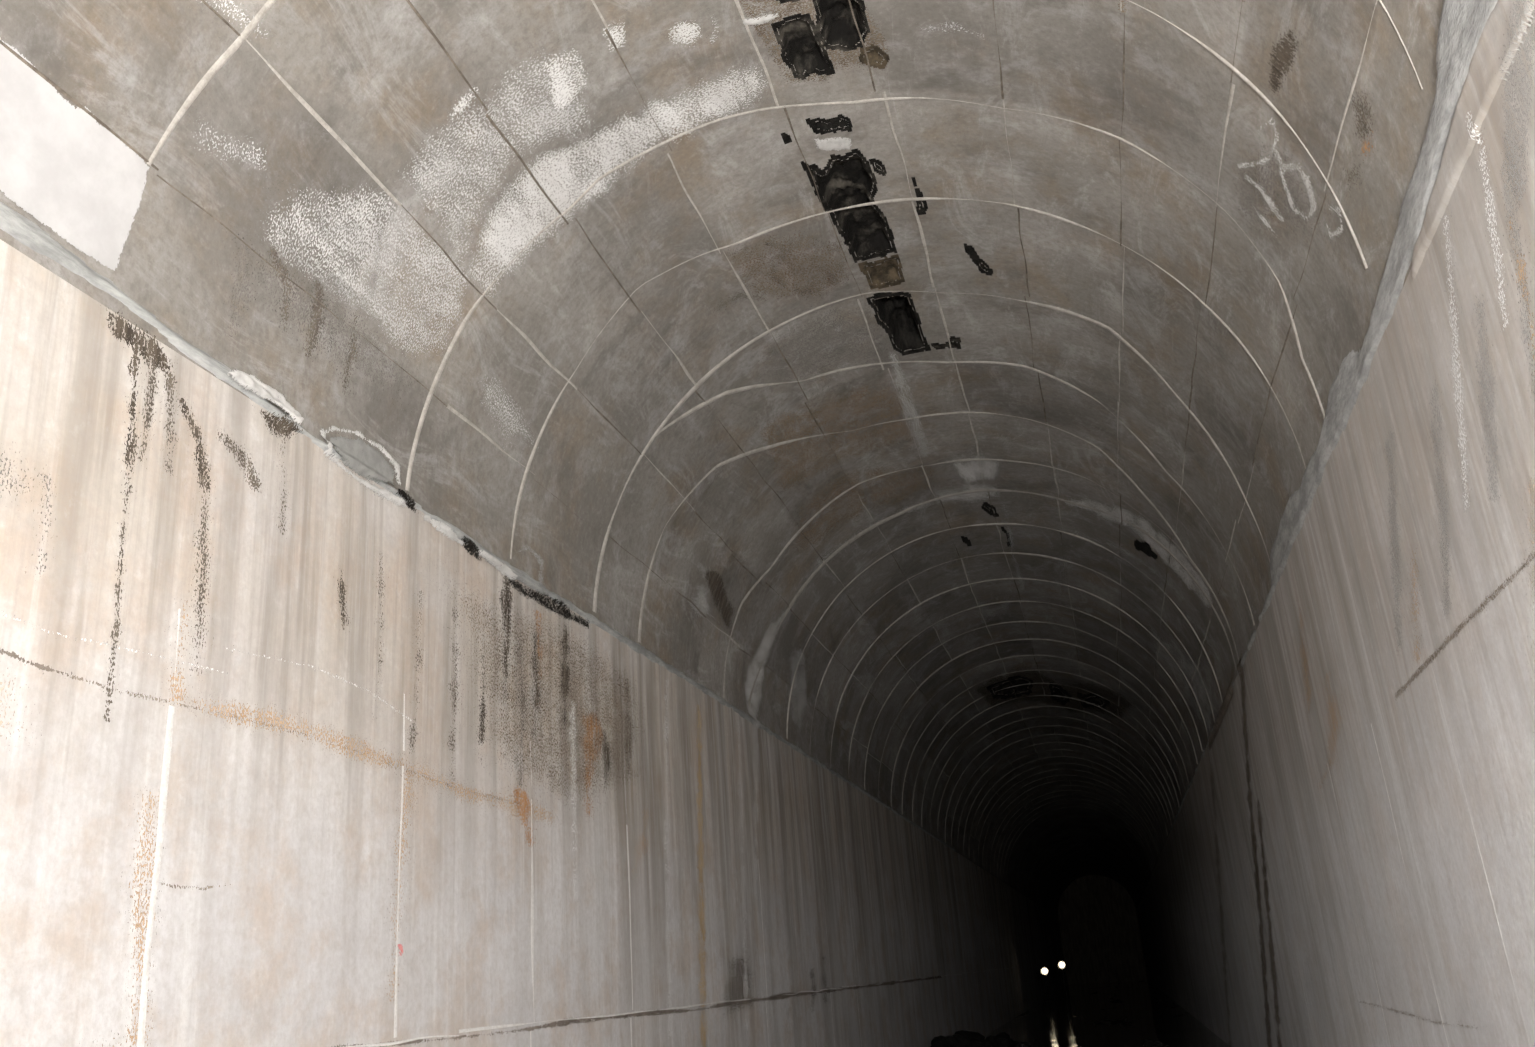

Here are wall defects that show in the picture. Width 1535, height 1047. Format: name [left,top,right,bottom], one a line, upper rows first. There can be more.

water stain [196,0,271,41]
spalling [739,0,890,84]
water stain [190,119,267,170]
spalling [801,114,961,356]
spalling [964,243,993,276]
water stain [0,452,56,574]
water stain [104,311,262,722]
water stain [261,409,303,535]
water stain [478,374,539,452]
water stain [337,571,349,630]
water stain [407,591,425,754]
water stain [443,574,674,1038]